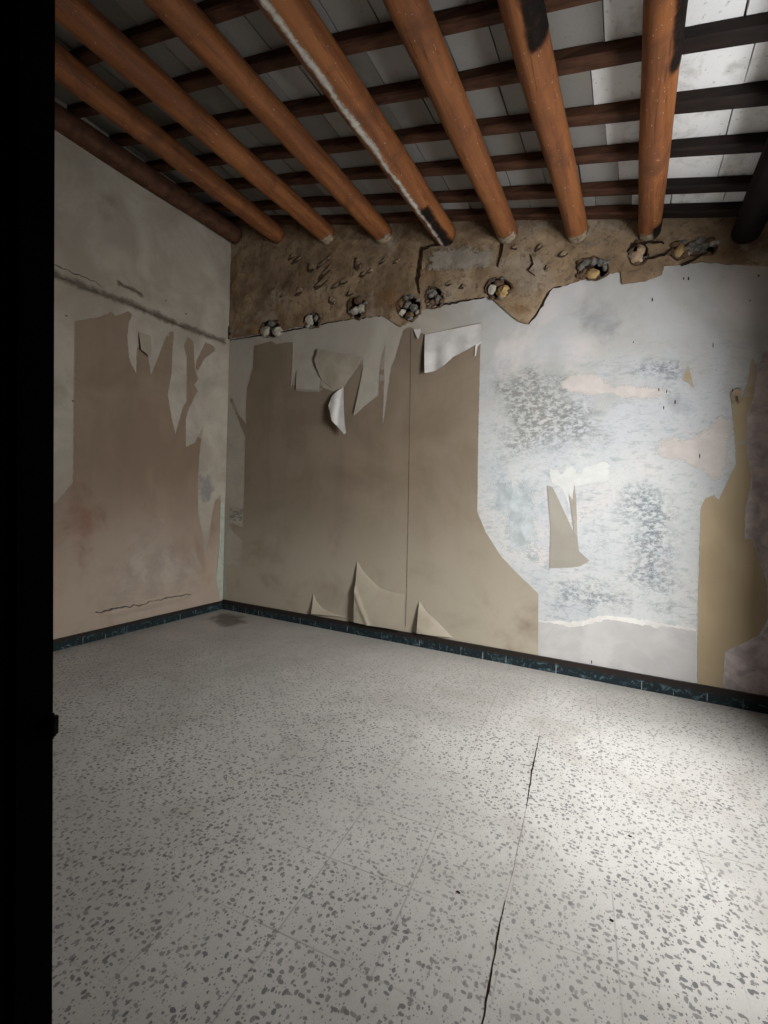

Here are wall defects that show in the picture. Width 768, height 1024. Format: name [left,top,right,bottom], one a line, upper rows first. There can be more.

spalling [228,217,768,340]
damp [489,476,542,563]
crack [481,735,540,1024]